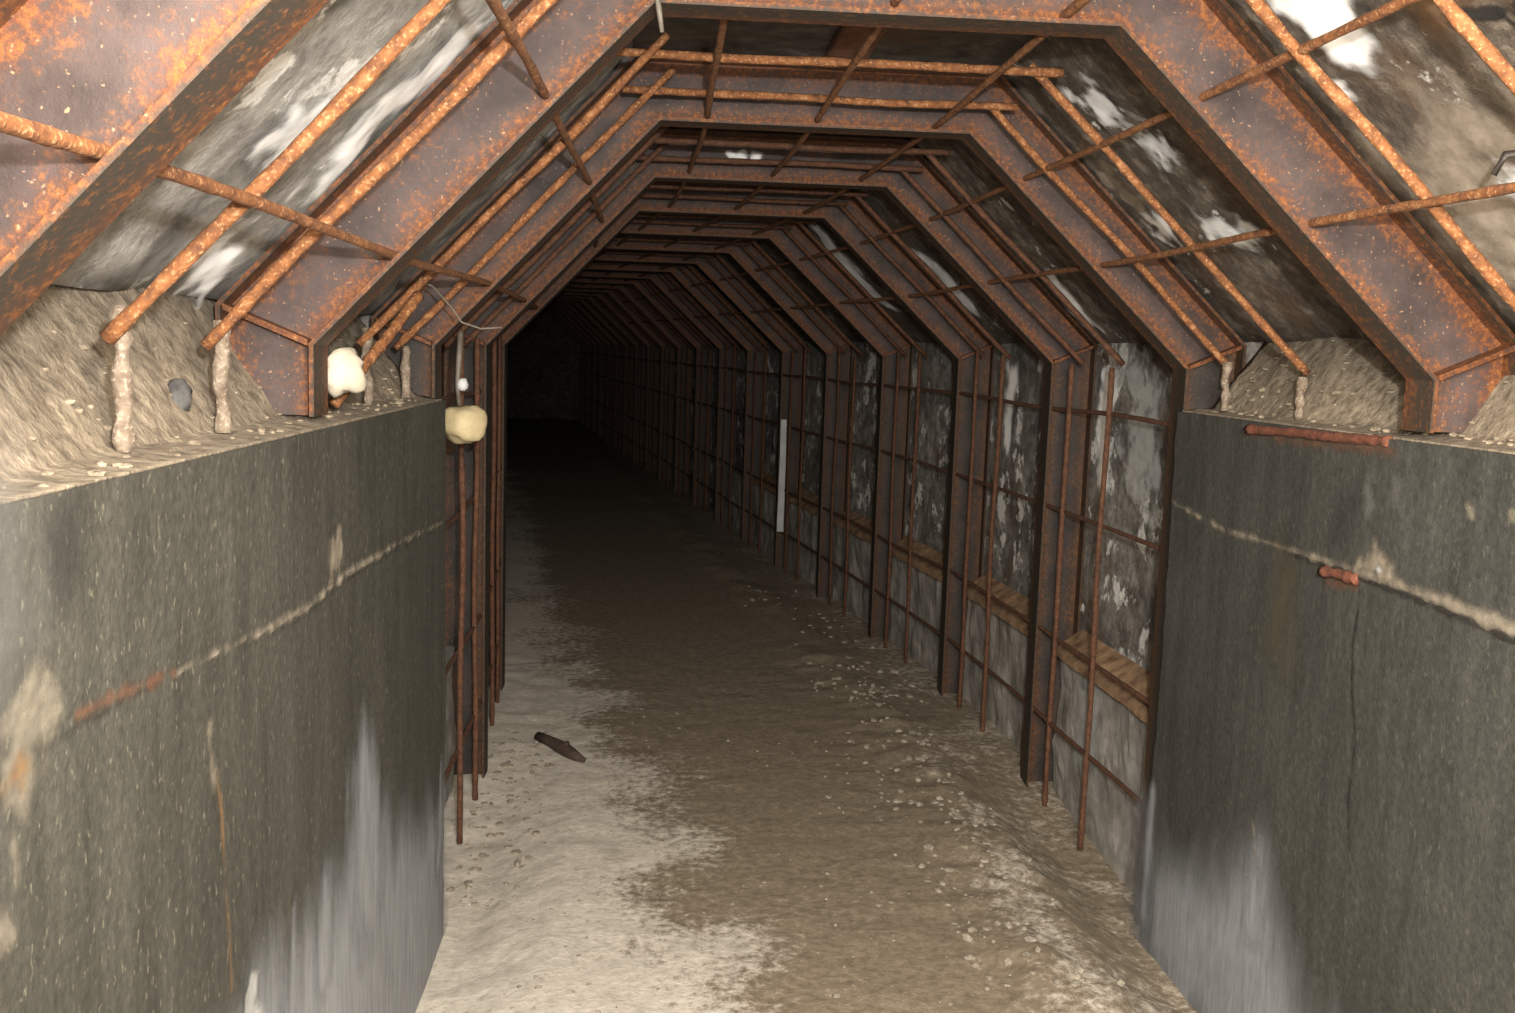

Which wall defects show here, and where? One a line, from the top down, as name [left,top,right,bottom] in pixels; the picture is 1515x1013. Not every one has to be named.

damp [1409,0,1465,33]
damp [1423,97,1515,281]
crack [179,522,442,673]
crack [1172,502,1515,850]
corrosion [210,758,224,843]
efflorescence [245,731,444,1013]
efflorescence [1141,785,1293,1013]